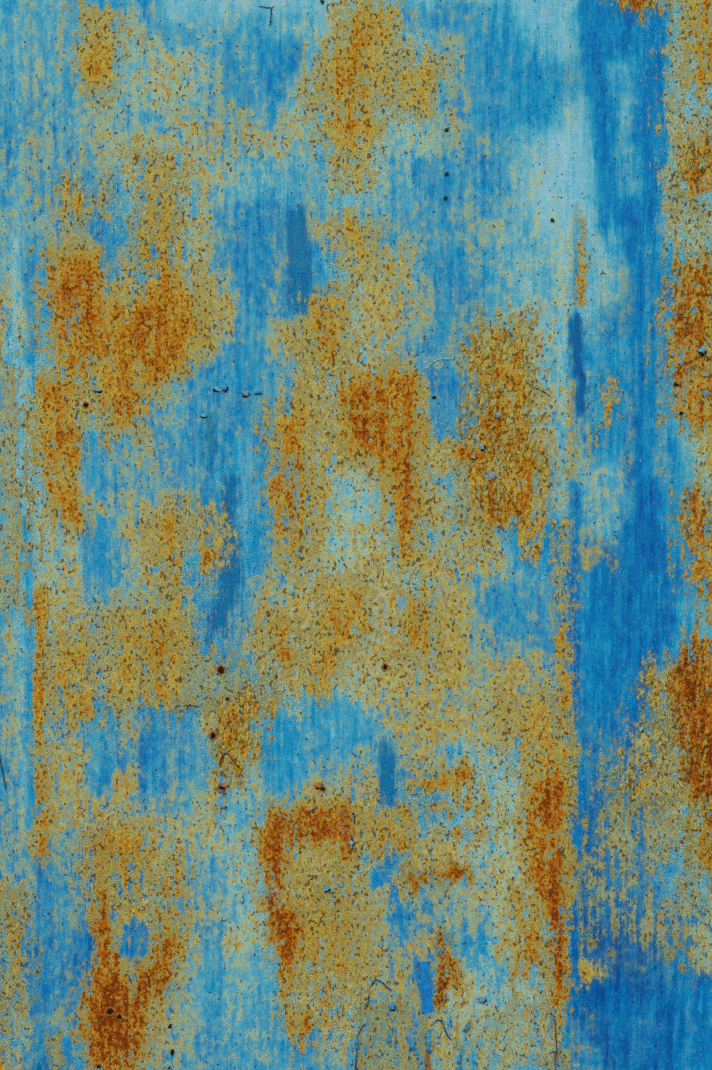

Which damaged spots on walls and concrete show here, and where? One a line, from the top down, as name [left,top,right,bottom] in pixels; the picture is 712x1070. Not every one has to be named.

corrosion [60,0,129,113]
corrosion [294,0,455,199]
corrosion [604,0,712,229]
corrosion [22,143,223,542]
corrosion [644,243,712,442]
corrosion [22,207,627,1070]
corrosion [600,467,712,891]